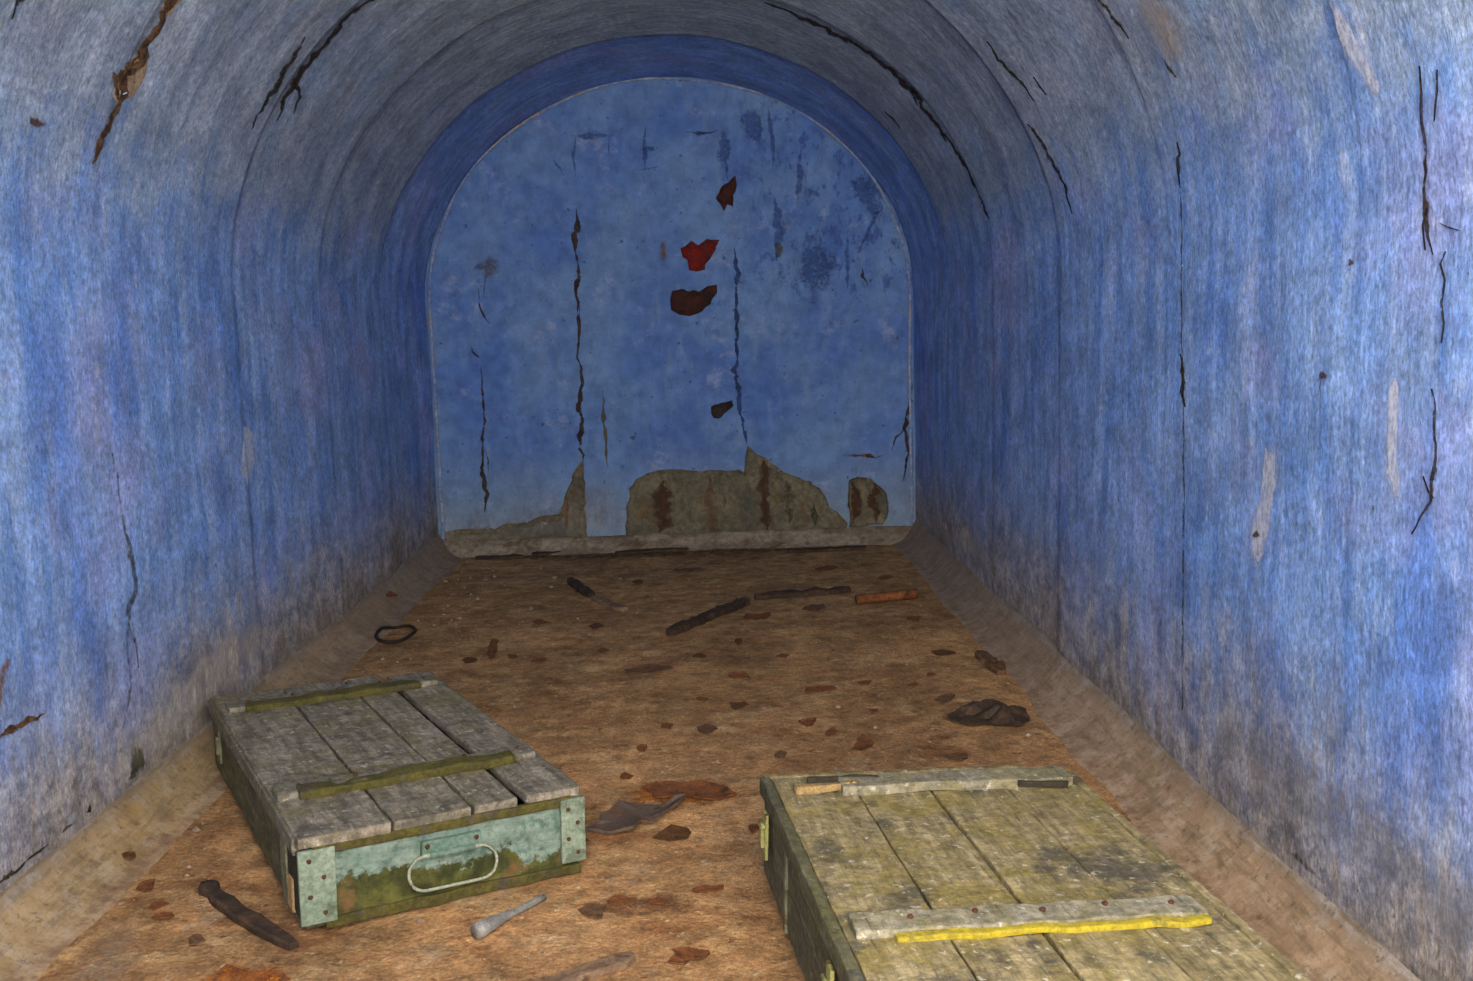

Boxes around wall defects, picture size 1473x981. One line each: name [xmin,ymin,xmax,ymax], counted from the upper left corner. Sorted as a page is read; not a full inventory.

crack [92,0,177,164]
crack [571,210,608,467]
peeling [670,239,719,316]
peeling [716,176,737,211]
crack [730,248,747,444]
spalling [625,446,889,535]
crack [1176,142,1186,709]
crack [1411,389,1437,534]
crack [1419,66,1460,343]